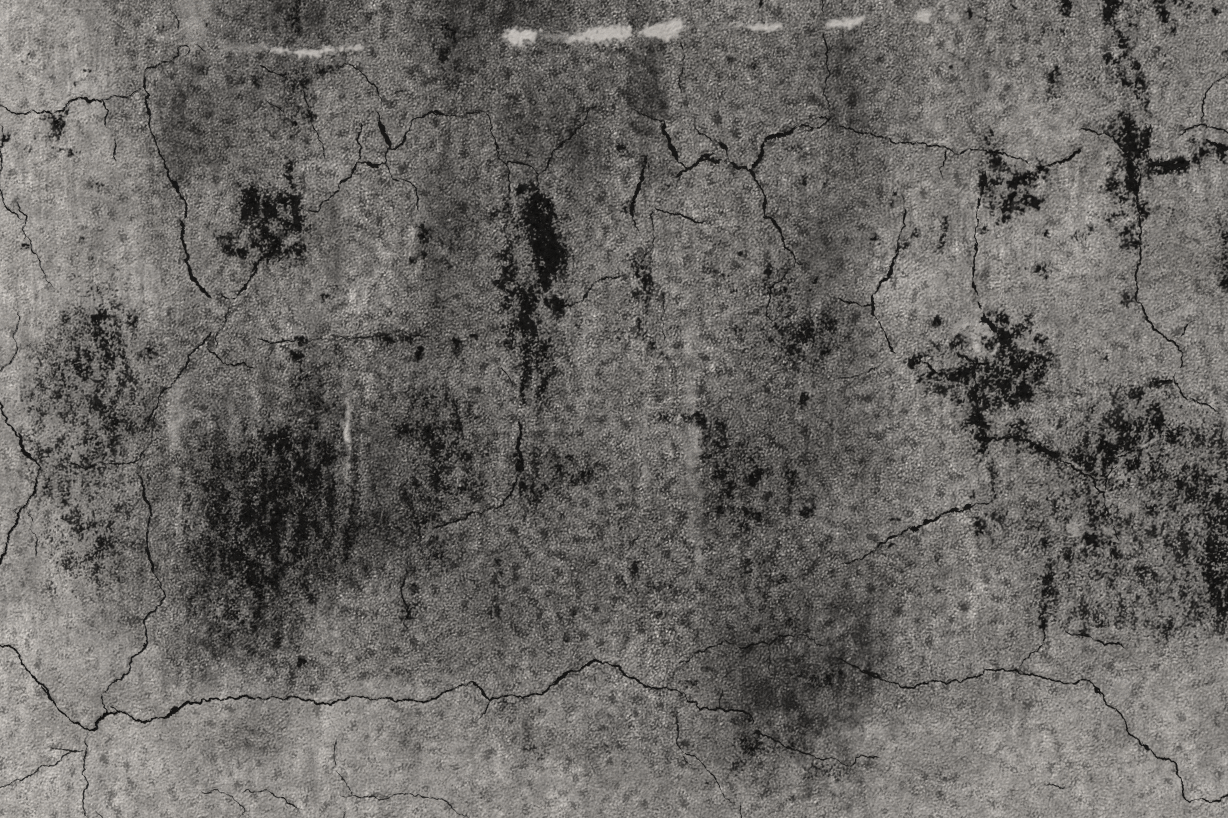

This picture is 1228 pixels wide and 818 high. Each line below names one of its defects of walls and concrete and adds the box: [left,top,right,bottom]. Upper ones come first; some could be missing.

damp [19,283,177,598]
damp [213,155,312,273]
damp [173,328,499,659]
crack [0,3,877,818]
damp [409,179,582,416]
crack [559,0,1228,411]
crack [841,502,990,564]
damp [977,126,1049,234]
crack [922,352,1134,541]
damp [903,304,1228,646]
damp [1071,0,1227,254]
crack [679,602,1228,803]